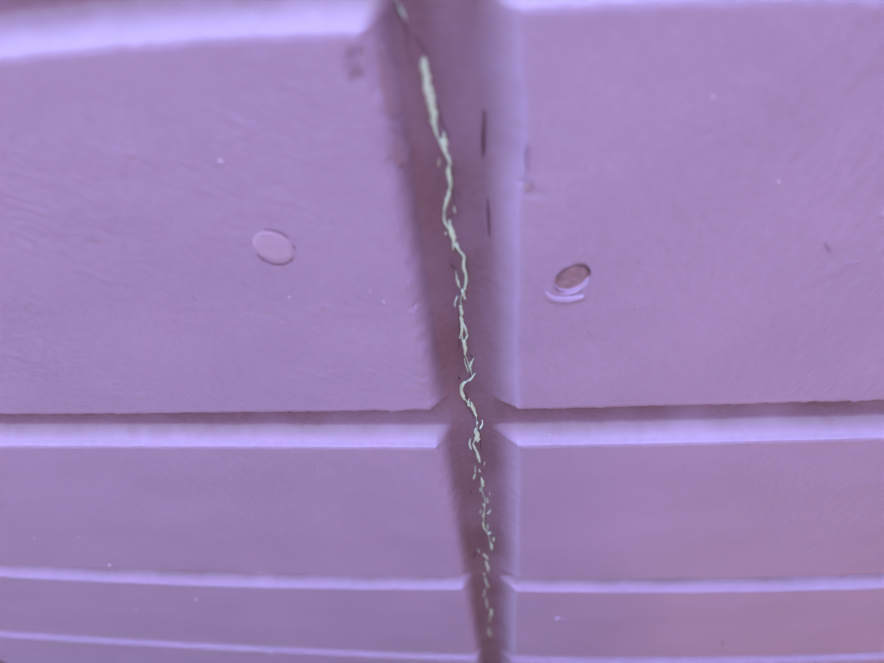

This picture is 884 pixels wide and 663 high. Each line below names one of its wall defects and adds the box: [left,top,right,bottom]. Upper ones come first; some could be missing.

crack [394,0,495,636]
spalling [544,264,590,304]